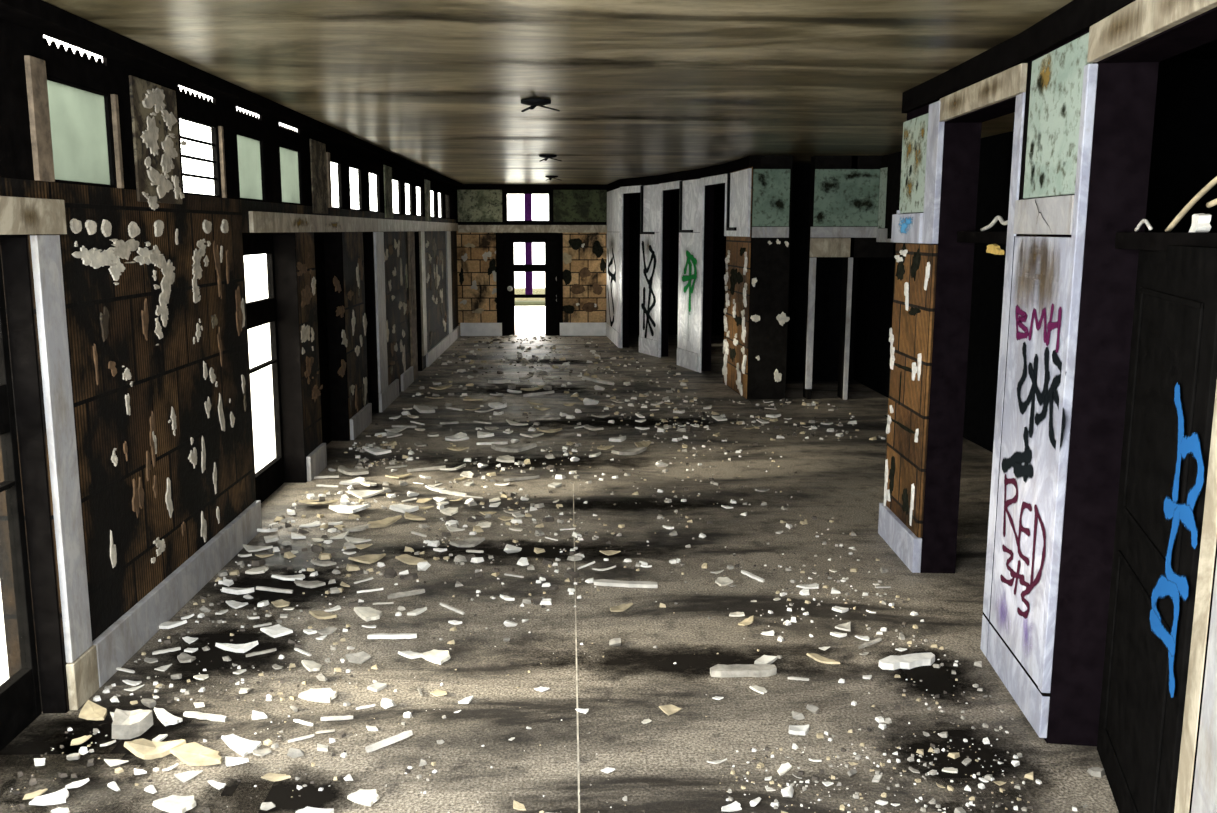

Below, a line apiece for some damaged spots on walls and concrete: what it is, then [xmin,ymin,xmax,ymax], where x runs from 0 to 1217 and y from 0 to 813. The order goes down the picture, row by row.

peeling [93,306,133,416]
peeling [72,238,175,345]
peeling [192,239,245,336]
peeling [193,314,247,432]
peeling [722,250,760,396]
peeling [776,312,790,326]
peeling [111,441,128,466]
peeling [132,407,186,536]
peeling [188,436,220,542]
peeling [151,537,166,563]